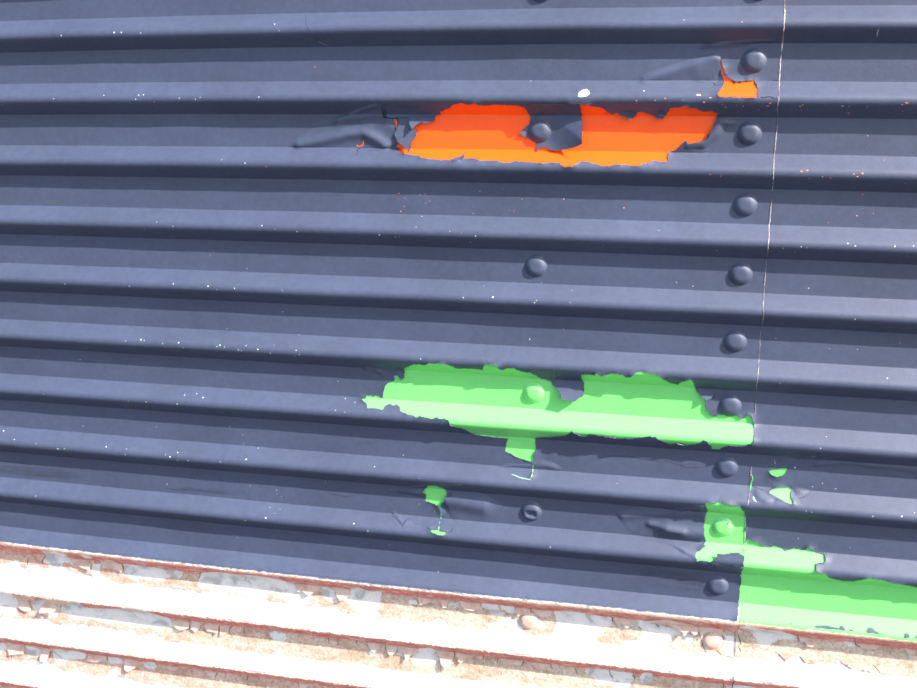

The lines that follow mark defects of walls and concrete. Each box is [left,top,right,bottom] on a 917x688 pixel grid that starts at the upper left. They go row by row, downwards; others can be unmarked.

peeling [386,61,776,167]
crack [755,0,785,411]
peeling [362,358,753,480]
peeling [418,486,453,535]
peeling [769,468,794,504]
peeling [42,549,386,621]
peeling [409,502,917,660]
peeling [0,588,233,637]
peeling [0,643,177,676]
peeling [356,641,484,669]
peeling [575,668,652,688]